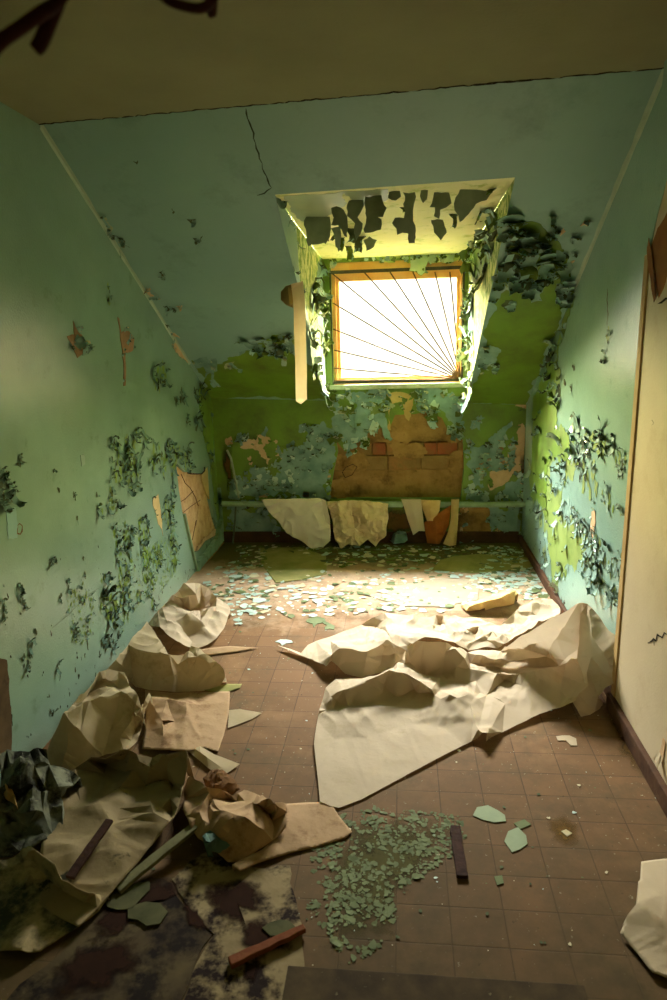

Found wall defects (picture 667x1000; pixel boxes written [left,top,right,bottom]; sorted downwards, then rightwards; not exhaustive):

crack [38,67,664,196]
peeling [0,453,27,514]
peeling [59,188,626,655]